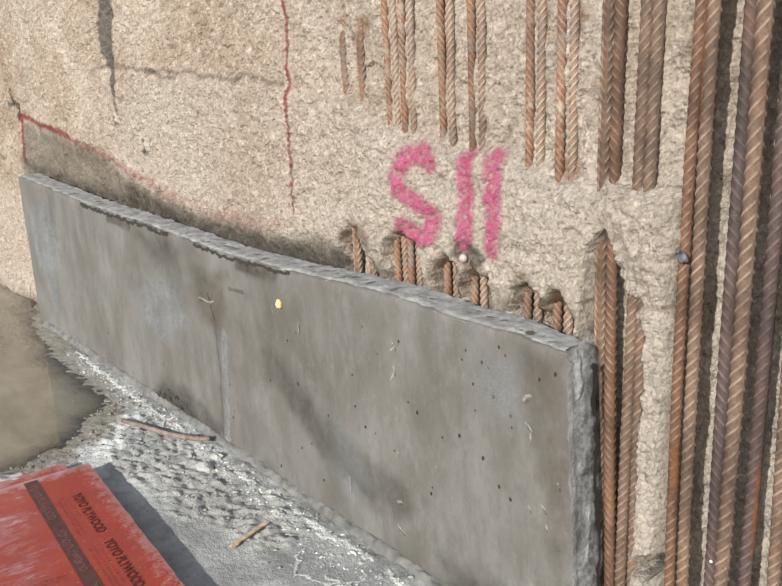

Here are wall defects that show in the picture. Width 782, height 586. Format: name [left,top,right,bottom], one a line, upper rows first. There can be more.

leakage [97,0,115,101]
spalling [341,225,492,309]
spalling [512,228,607,585]
spalling [614,255,637,535]